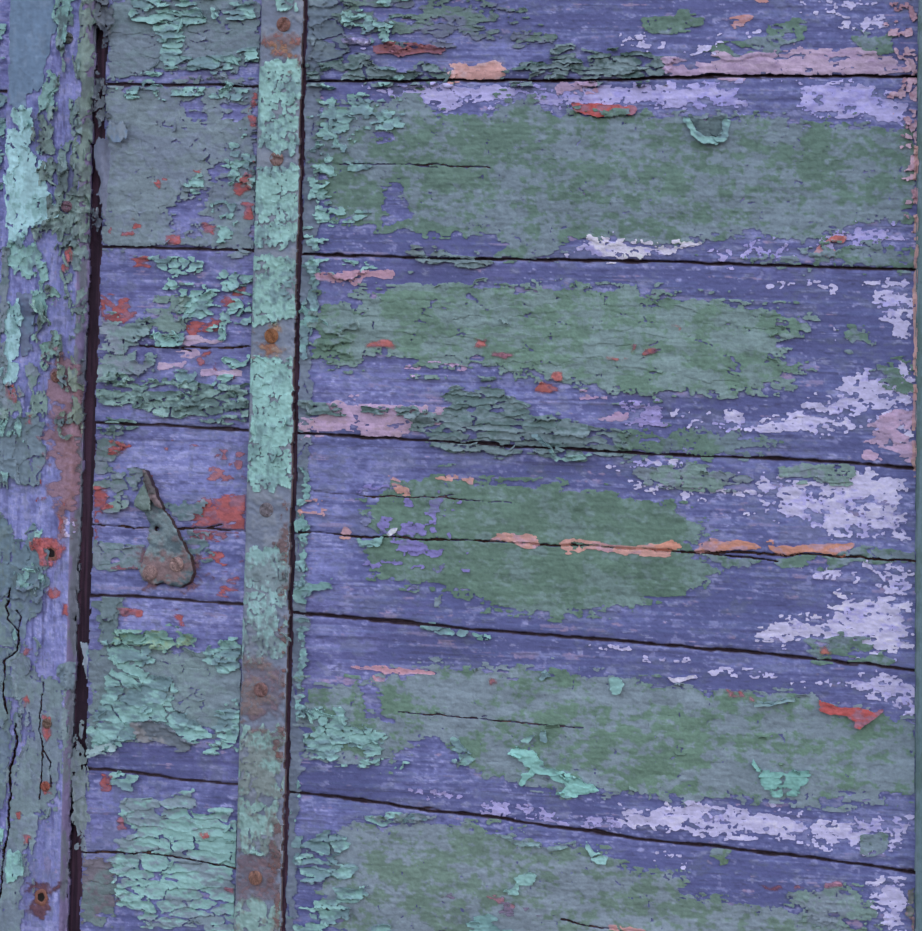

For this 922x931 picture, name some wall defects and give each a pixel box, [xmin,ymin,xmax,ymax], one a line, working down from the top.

peeling [0,0,301,493]
corrosion [37,347,83,540]
peeling [285,0,919,931]
crack [334,534,505,543]
crack [540,542,614,550]
crack [654,550,916,562]
crack [0,588,52,898]
peeling [0,512,291,931]
corrosion [25,882,61,920]
corrosion [236,814,282,927]
crack [561,918,604,929]